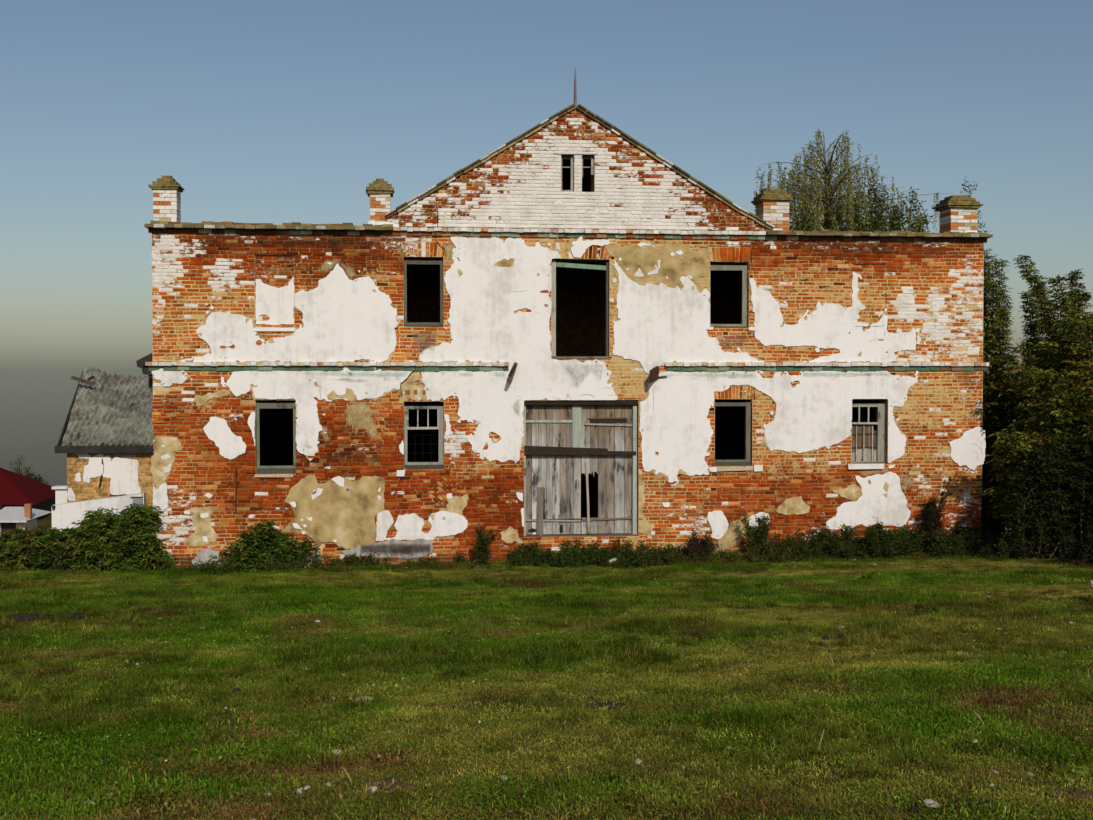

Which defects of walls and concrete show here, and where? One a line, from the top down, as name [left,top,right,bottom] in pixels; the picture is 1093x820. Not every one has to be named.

spalling [67,111,986,569]